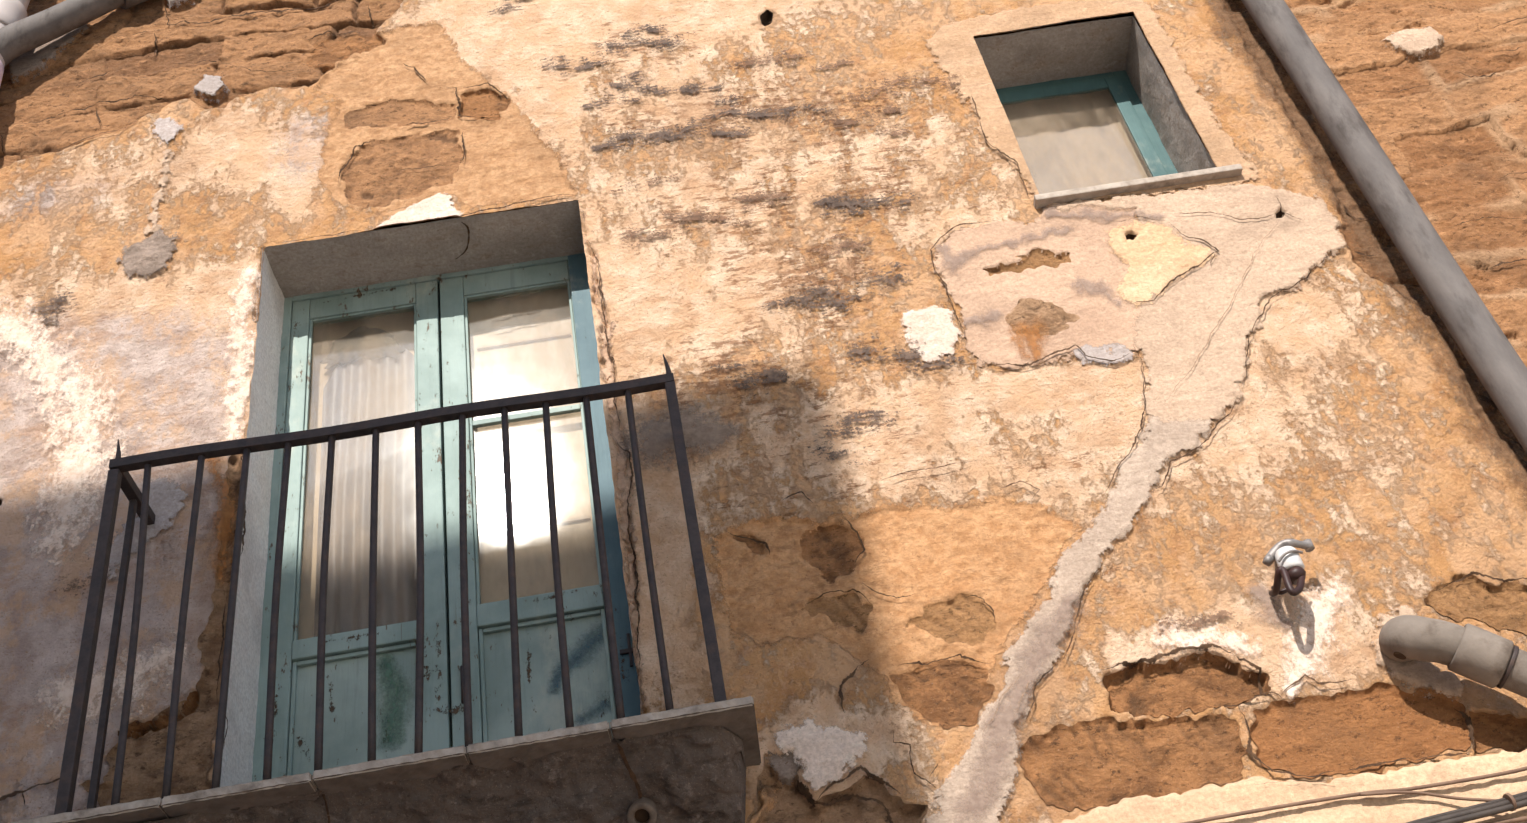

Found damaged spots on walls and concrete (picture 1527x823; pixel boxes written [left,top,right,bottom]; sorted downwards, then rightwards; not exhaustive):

peeling [0,0,647,714]